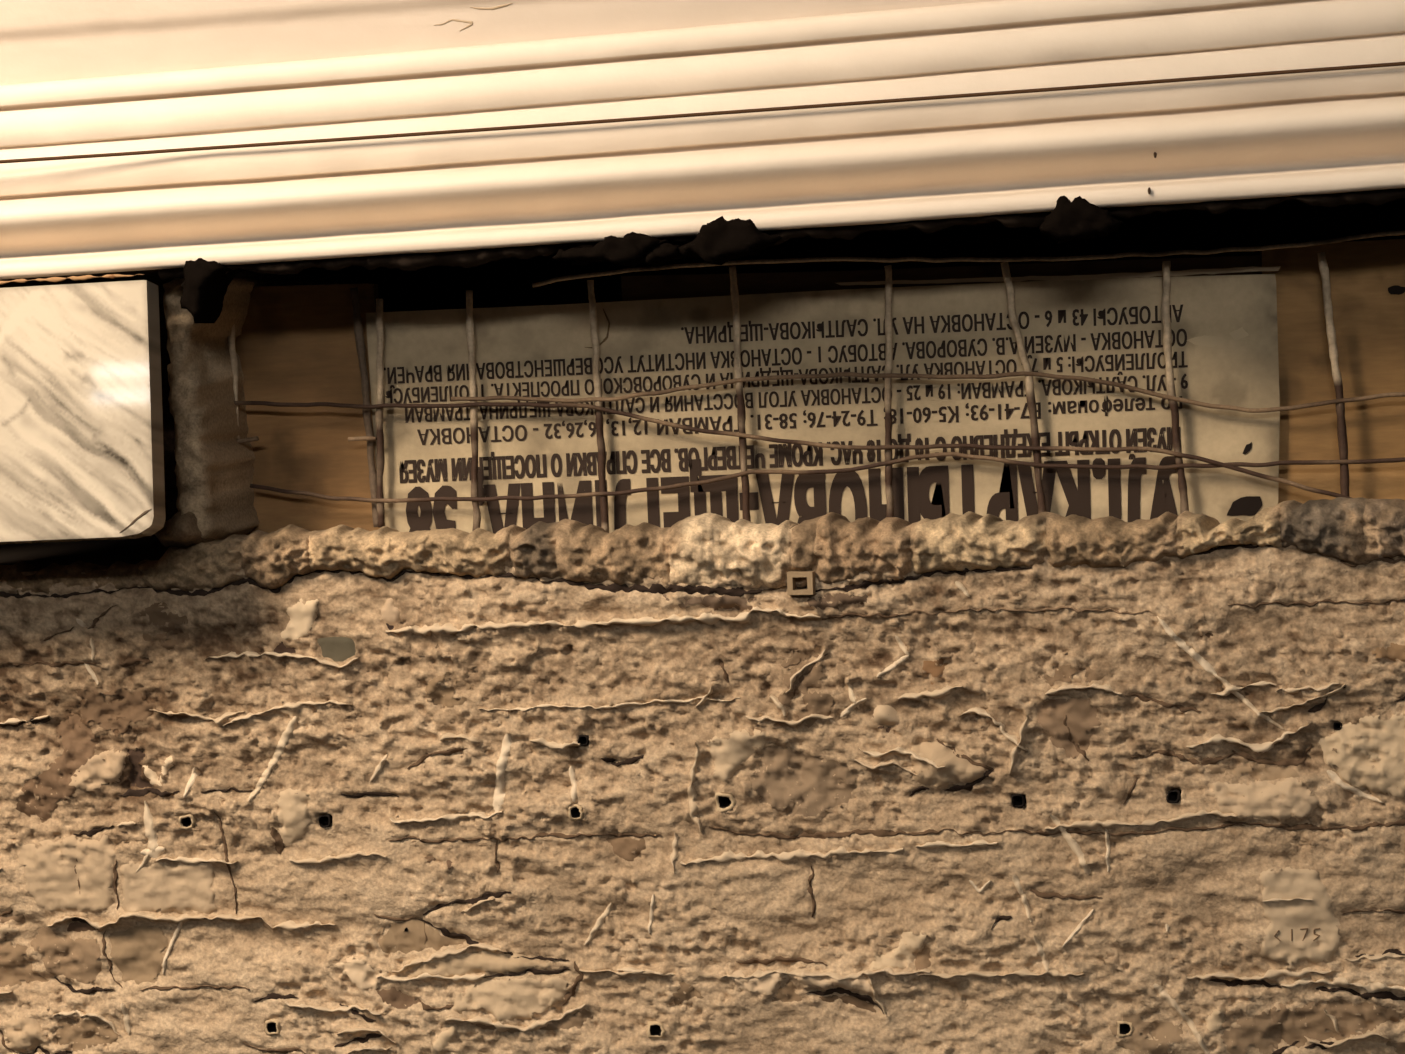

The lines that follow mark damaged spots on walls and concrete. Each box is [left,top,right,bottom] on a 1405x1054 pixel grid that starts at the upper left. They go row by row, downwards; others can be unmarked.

spalling [552,216,782,267]
spalling [180,258,245,323]
spalling [154,510,215,548]
crack [0,567,1151,668]
crack [710,686,1405,917]
spalling [378,917,466,954]
crack [991,889,1101,930]
flaking render [335,955,422,1009]
crack [736,956,884,1014]
crack [1209,978,1281,988]
crack [1316,949,1405,1001]
flaking render [430,976,593,1054]